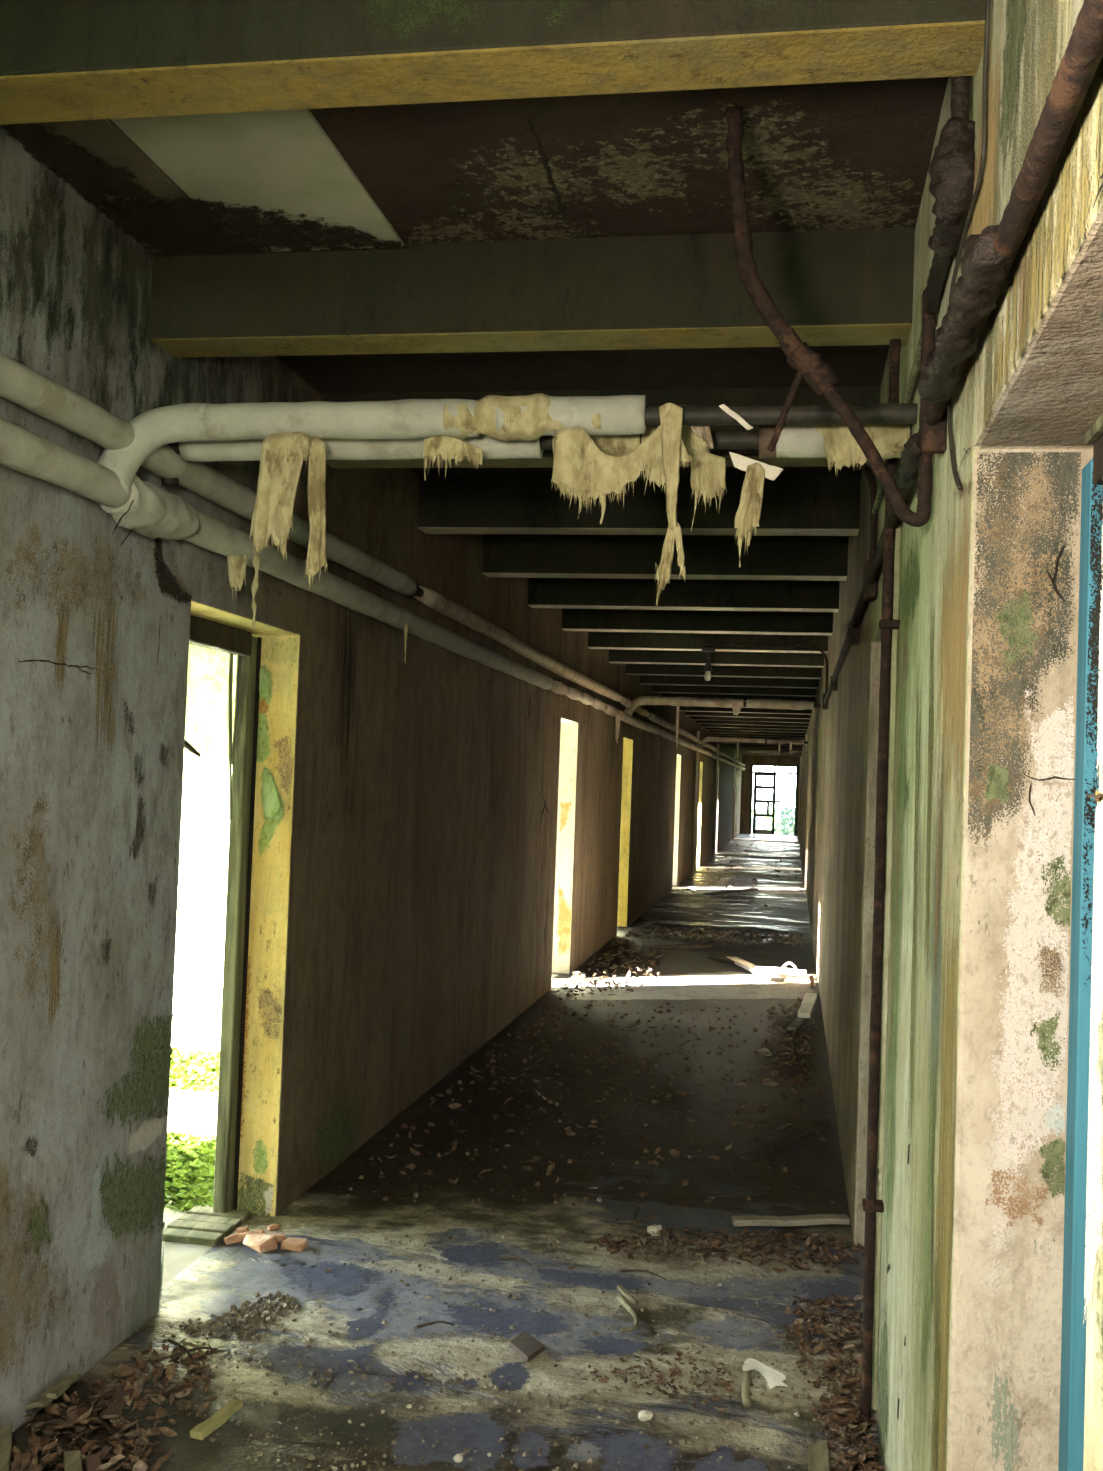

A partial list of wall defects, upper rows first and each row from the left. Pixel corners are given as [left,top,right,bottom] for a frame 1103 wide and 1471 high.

damp [967,0,1083,235]
crack [1093,106,1103,208]
damp [887,578,910,1093]
damp [920,60,1103,1471]
damp [126,1116,167,1157]